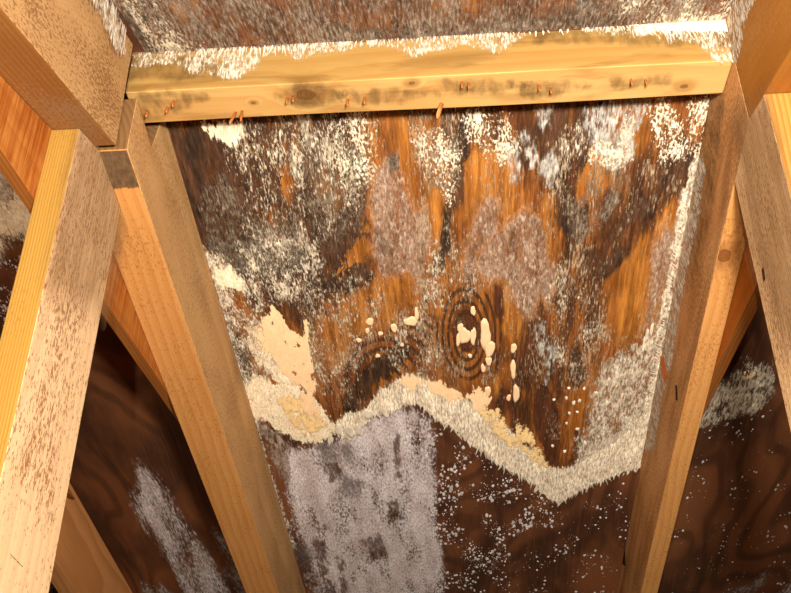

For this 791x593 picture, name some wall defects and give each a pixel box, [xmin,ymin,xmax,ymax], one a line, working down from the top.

leakage [90,0,754,80]
leakage [0,171,31,272]
leakage [736,107,791,339]
leakage [166,94,711,593]
leakage [700,356,775,443]
leakage [130,465,245,593]